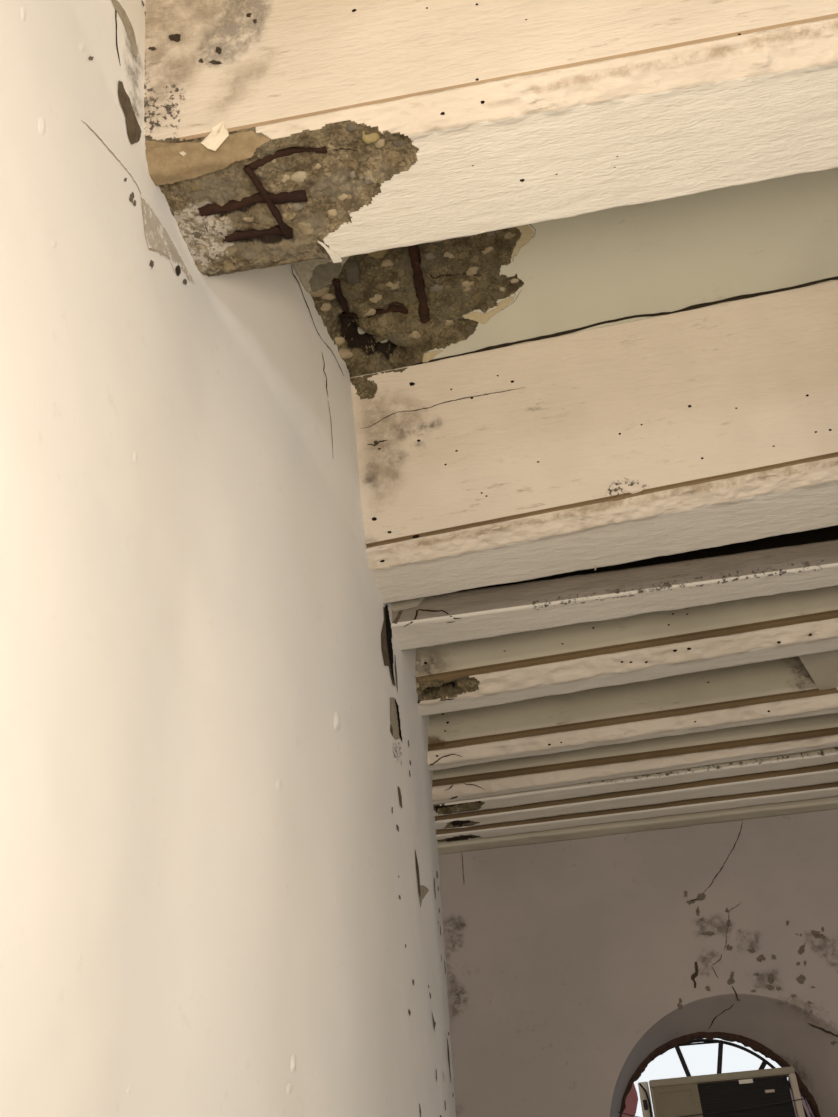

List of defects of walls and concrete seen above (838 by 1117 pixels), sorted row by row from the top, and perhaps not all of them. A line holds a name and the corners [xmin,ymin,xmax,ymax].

peeling [112,0,137,58]
damp [199,0,266,65]
damp [129,48,185,131]
spalling [118,81,536,400]
crack [412,276,838,366]
flaking render [381,605,411,776]
spalling [416,676,480,704]
spalling [433,801,485,842]
peeling [415,850,441,934]
crack [689,822,743,905]
crack [709,902,741,1028]